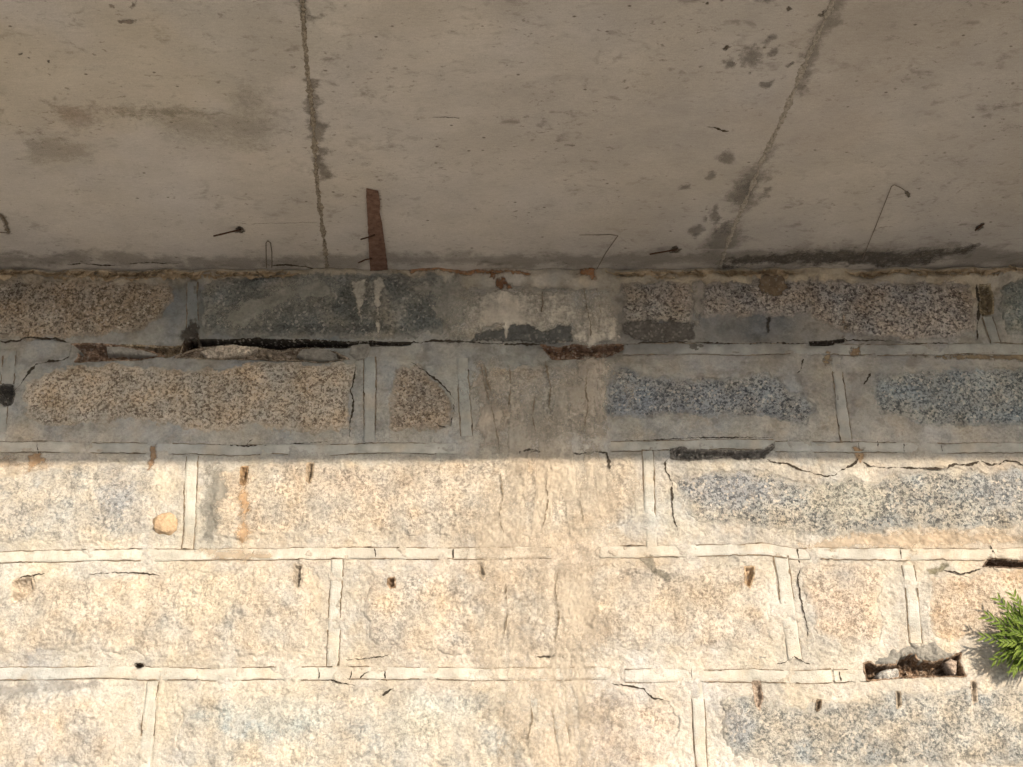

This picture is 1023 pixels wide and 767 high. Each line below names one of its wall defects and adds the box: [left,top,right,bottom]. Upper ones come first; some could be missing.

crack [1,336,69,390]
crack [573,436,1023,527]
spalling [874,669,899,679]
spalling [941,659,957,676]